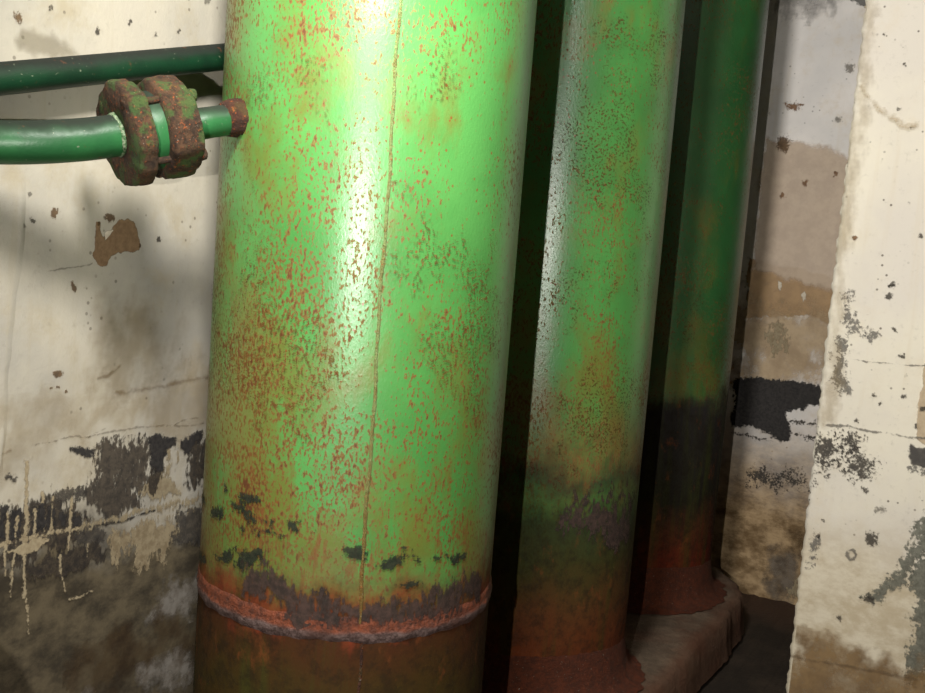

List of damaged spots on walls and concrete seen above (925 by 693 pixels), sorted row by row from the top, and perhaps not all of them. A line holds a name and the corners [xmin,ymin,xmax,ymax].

peeling [93,213,141,267]
rust [209,250,339,443]
rust [395,222,499,422]
peeling [917,367,925,444]
damp [0,449,202,600]
damp [789,633,925,693]